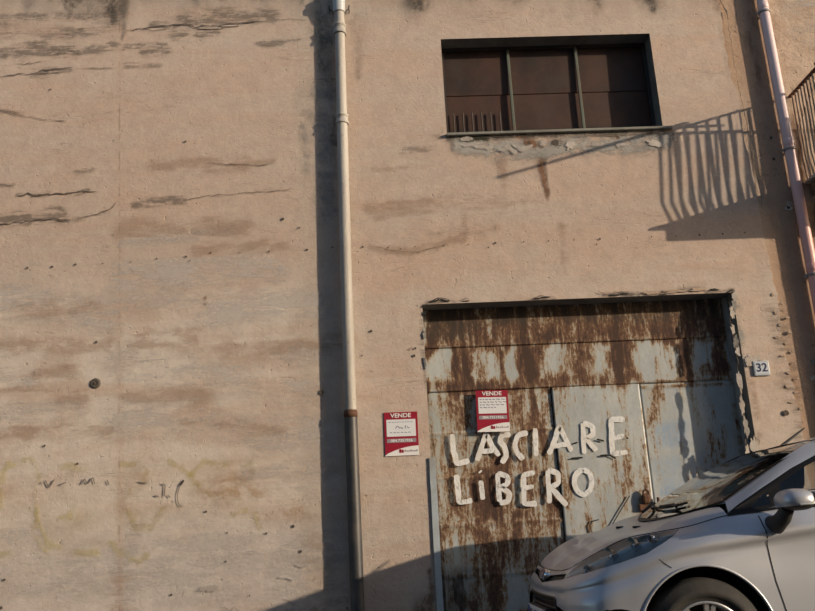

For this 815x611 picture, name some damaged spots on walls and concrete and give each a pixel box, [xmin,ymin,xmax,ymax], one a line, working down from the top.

corrosion [539,147,550,196]
spalling [453,133,672,159]
crack [719,0,763,208]
spalling [597,288,760,454]